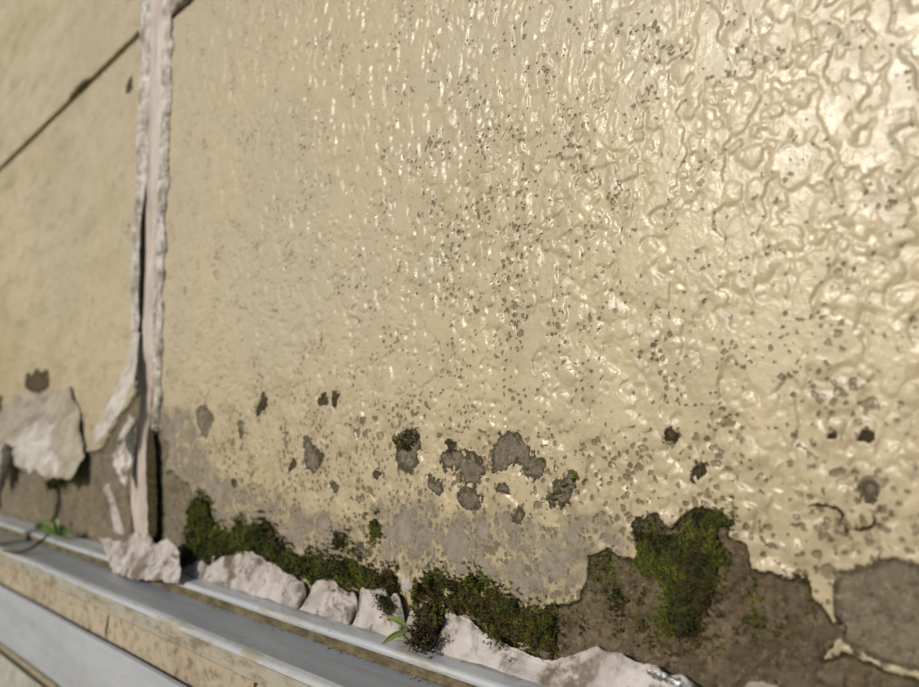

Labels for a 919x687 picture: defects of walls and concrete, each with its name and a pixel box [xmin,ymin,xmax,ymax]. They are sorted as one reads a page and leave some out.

peeling [318,391,340,407]
spalling [0,332,140,543]
spalling [153,430,193,568]
peeling [288,435,325,474]
peeling [395,427,422,475]
peeling [428,430,546,511]
peeling [546,470,579,510]
peeling [662,426,680,443]
peeling [690,460,709,484]
peeling [857,426,875,443]
water stain [374,503,617,605]
spalling [529,507,919,687]